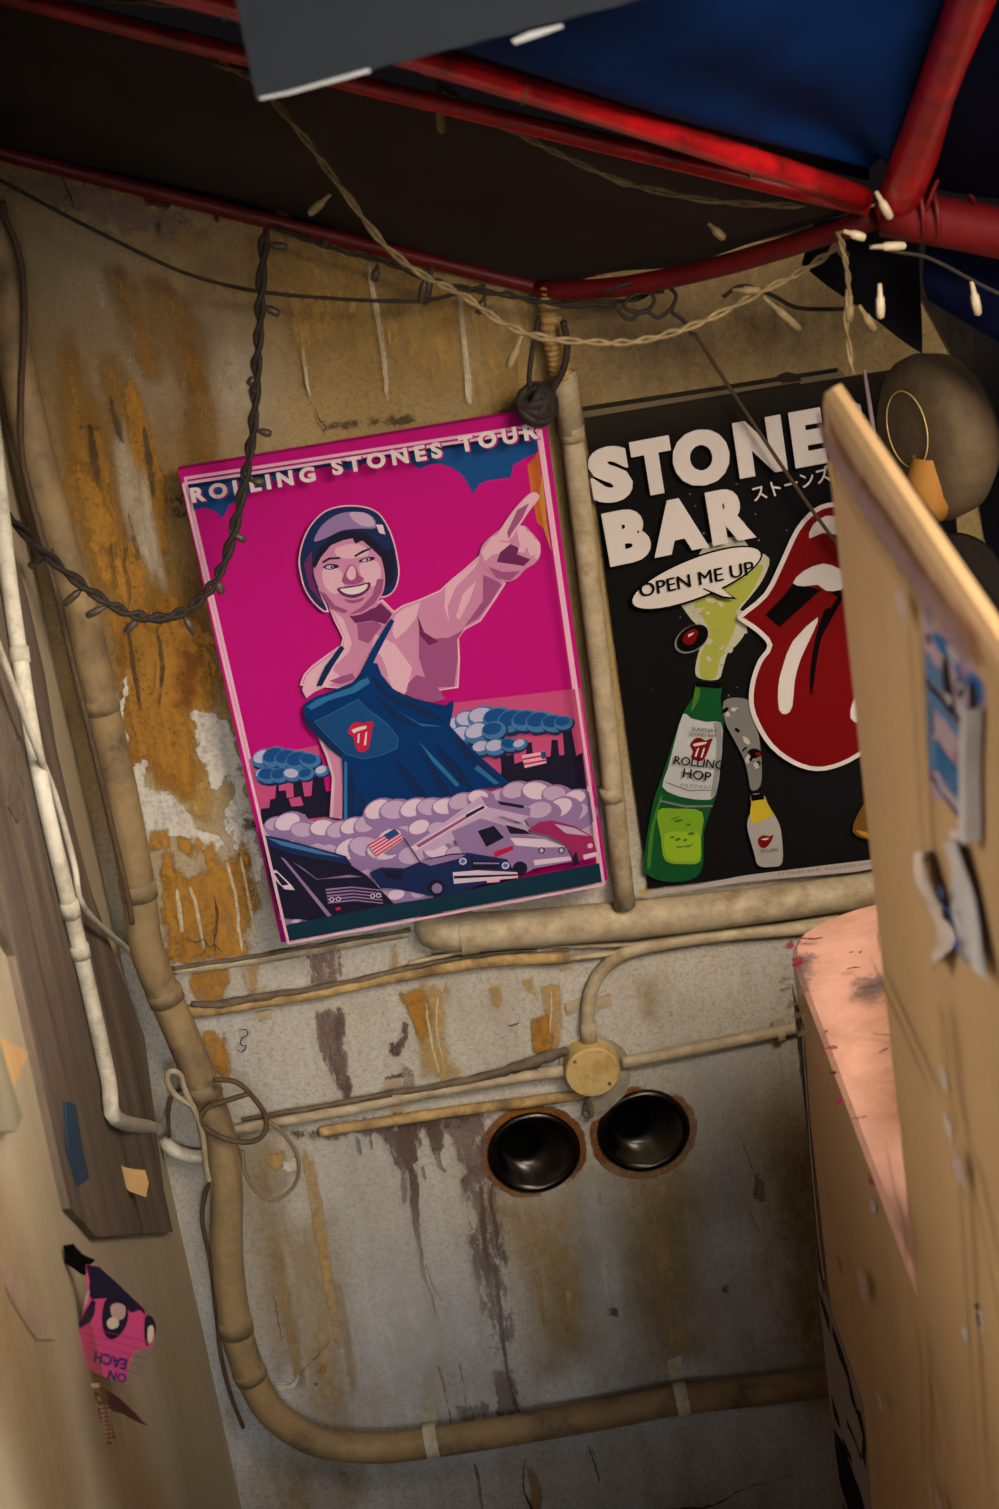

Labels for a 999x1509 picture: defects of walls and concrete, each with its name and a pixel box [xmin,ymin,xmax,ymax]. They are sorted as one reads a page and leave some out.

peeling [119,677,129,741]
peeling [133,710,264,896]
rust [400,985,459,1079]
rust [490,987,501,1007]
rust [523,979,562,1054]
crack [522,1457,542,1509]
crack [679,1475,793,1509]